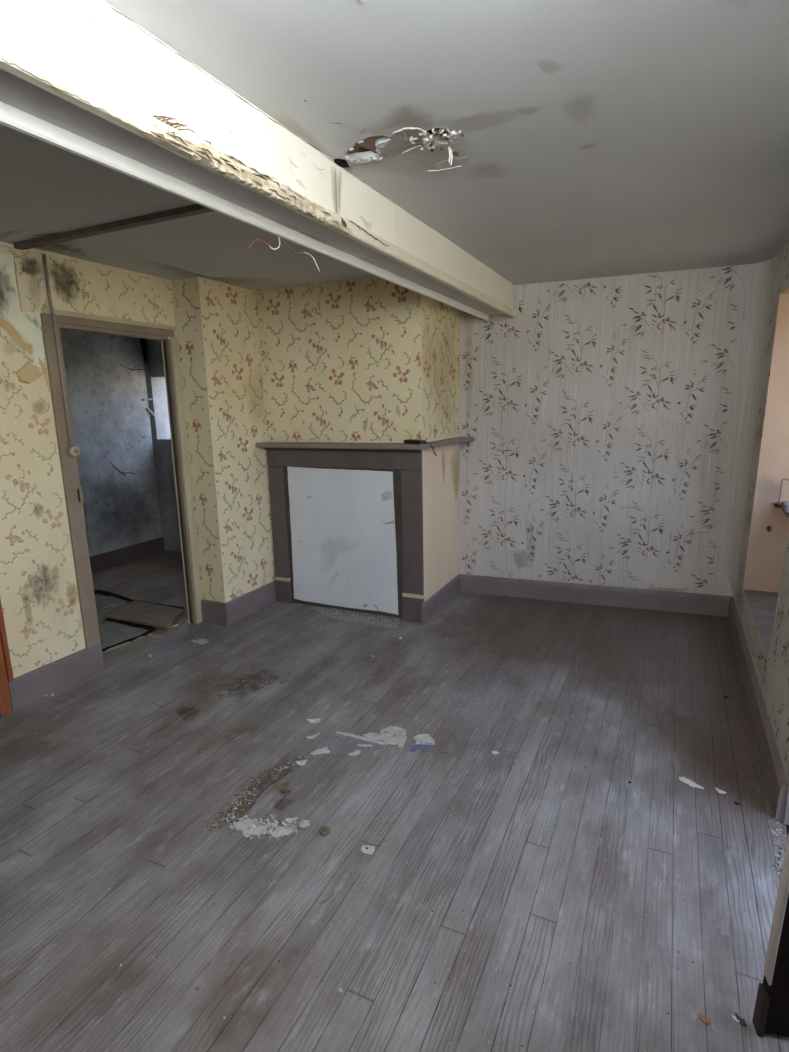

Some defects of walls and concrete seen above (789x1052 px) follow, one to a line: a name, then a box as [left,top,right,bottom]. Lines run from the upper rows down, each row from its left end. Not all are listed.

crack [100,0,431,228]
spalling [333,141,364,168]
flaking render [372,127,464,160]
spalling [142,115,352,236]
water stain [54,267,76,297]
peeling [16,362,43,384]